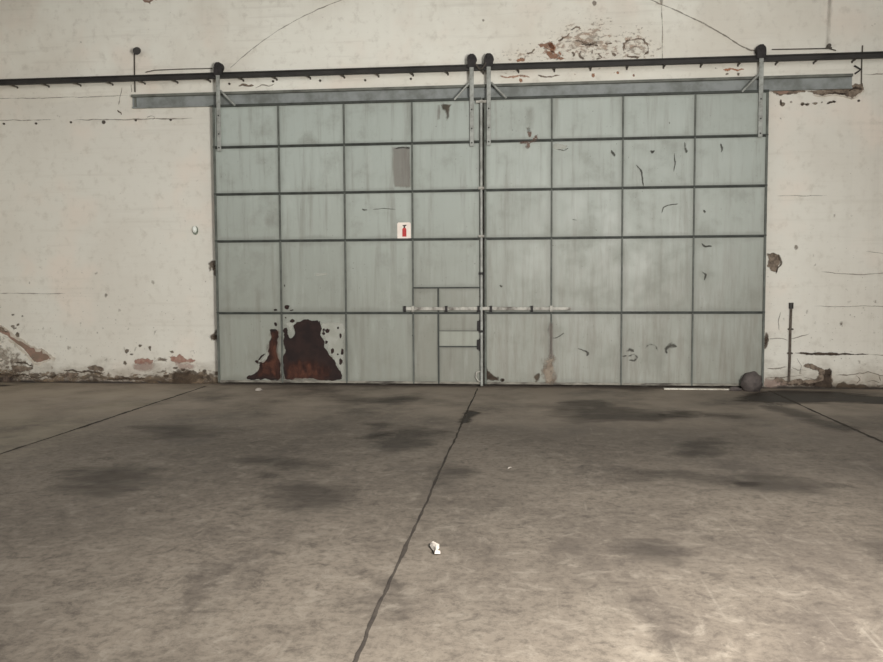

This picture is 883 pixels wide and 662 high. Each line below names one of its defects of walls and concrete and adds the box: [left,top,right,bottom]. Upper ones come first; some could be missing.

peeling [517,26,649,62]
flaking render [773,83,864,106]
flaking render [0,314,219,384]
corrosion [247,305,344,381]